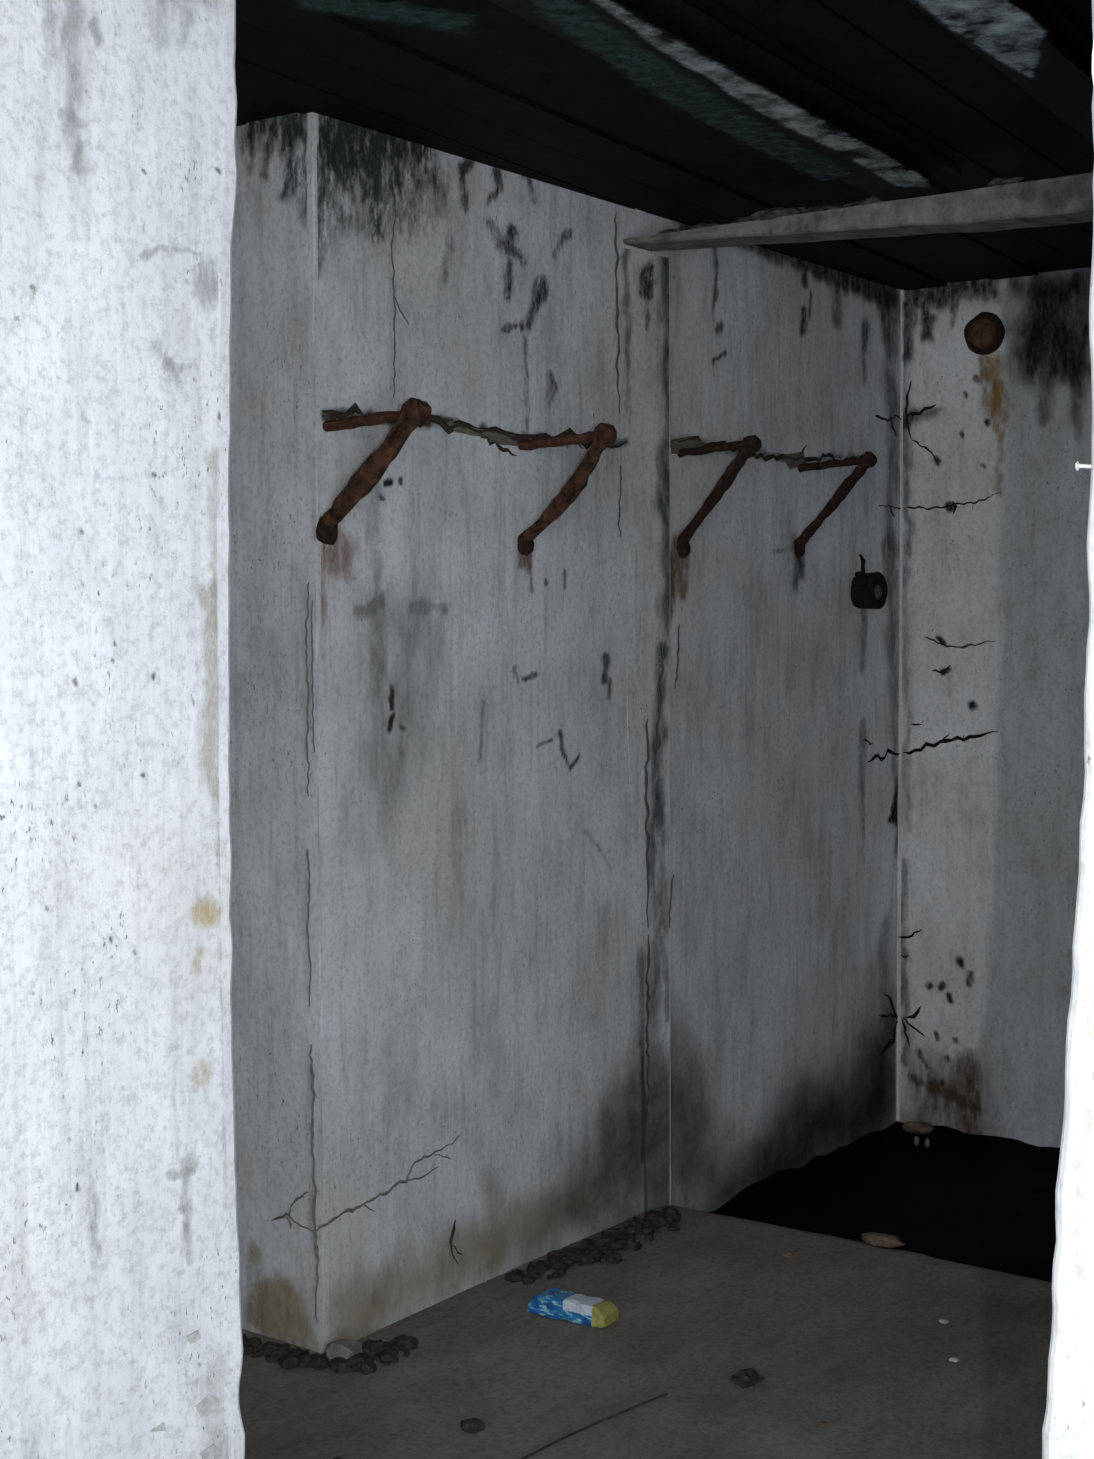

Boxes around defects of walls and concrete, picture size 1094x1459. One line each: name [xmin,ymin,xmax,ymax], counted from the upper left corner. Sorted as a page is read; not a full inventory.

water stain [245,112,440,235]
water stain [458,159,474,210]
water stain [488,167,503,203]
water stain [496,225,523,299]
water stain [502,278,548,344]
rust [986,357,1001,416]
water stain [623,250,670,627]
crack [305,582,315,796]
crack [864,724,998,762]
crack [305,849,313,1007]
crack [271,1044,460,1322]
crack [449,1220,462,1264]